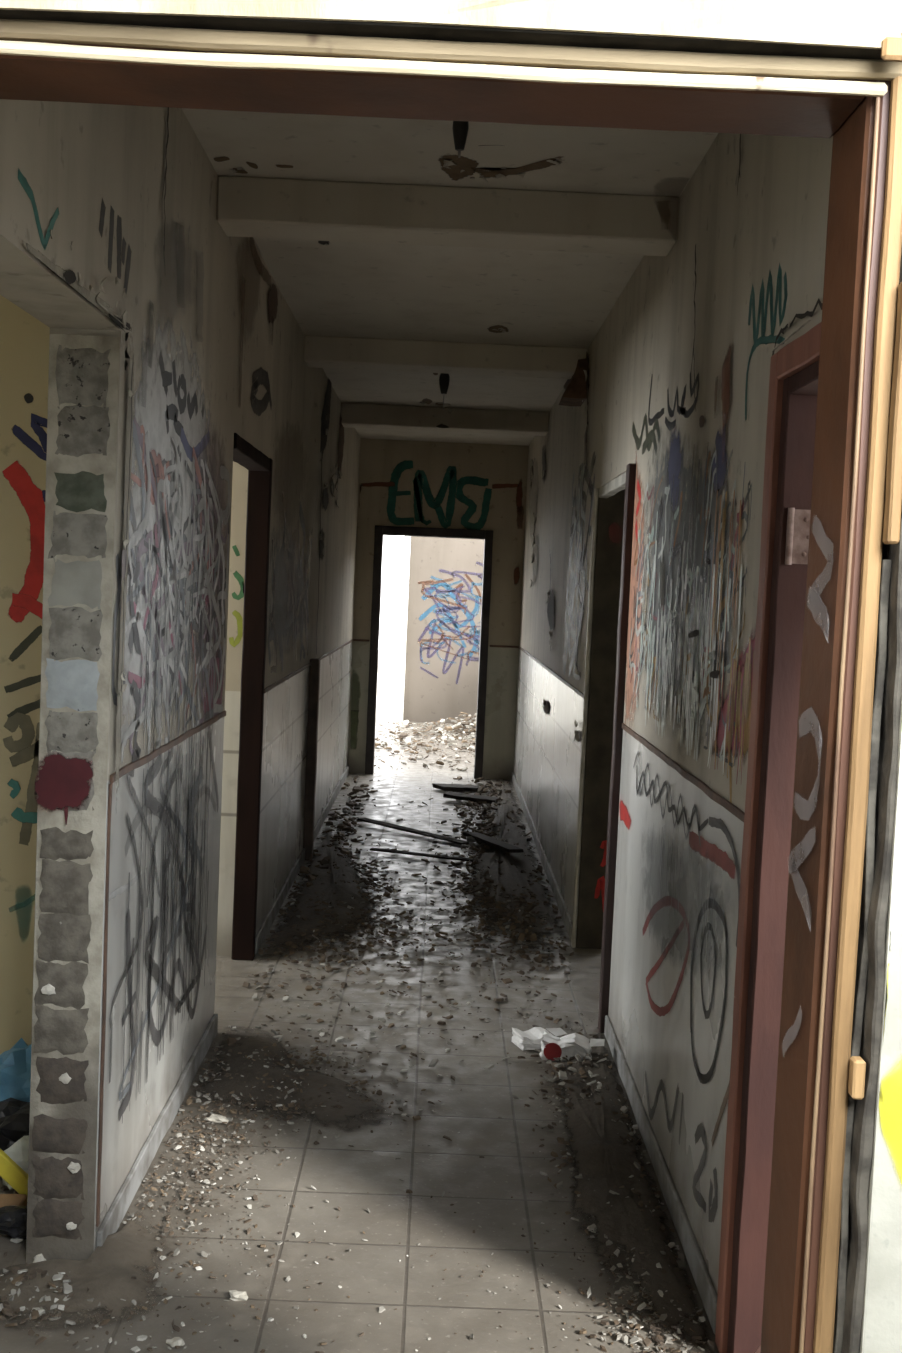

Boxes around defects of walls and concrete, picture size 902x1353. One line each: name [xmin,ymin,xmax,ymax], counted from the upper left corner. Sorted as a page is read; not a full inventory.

flaking render [26,243,134,1263]